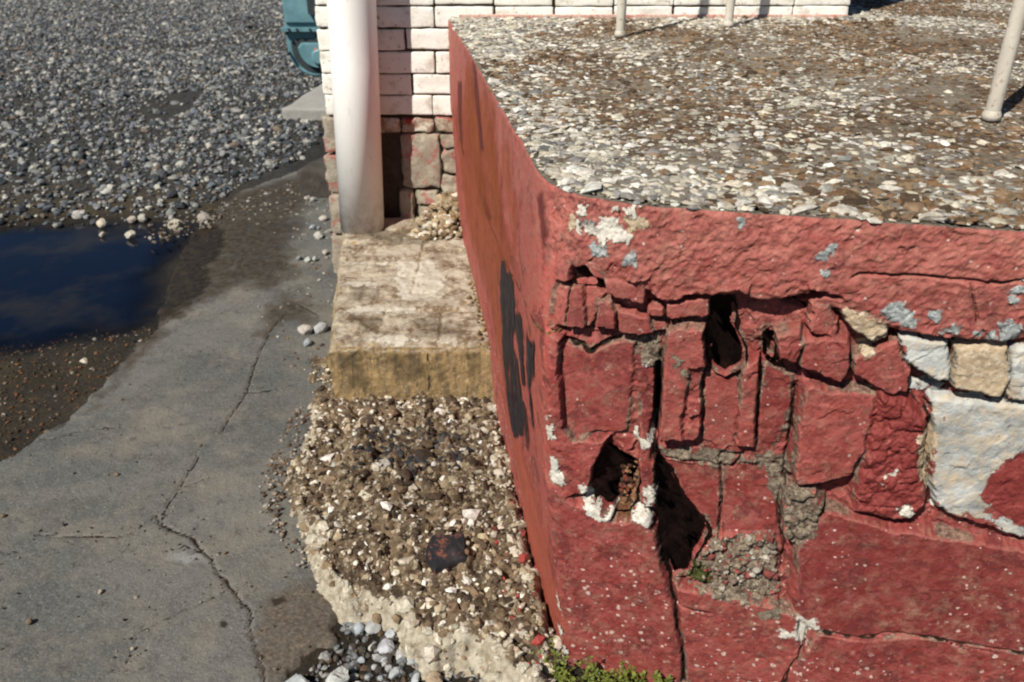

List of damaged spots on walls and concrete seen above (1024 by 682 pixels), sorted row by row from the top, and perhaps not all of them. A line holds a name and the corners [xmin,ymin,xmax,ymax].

peeling [568,204,651,288]
spalling [634,330,689,381]
spalling [706,294,749,380]
spalling [762,329,786,368]
crack [918,274,1024,340]
spalling [839,280,1024,537]
spalling [549,407,829,644]
crack [658,514,706,680]
crack [782,630,1024,682]